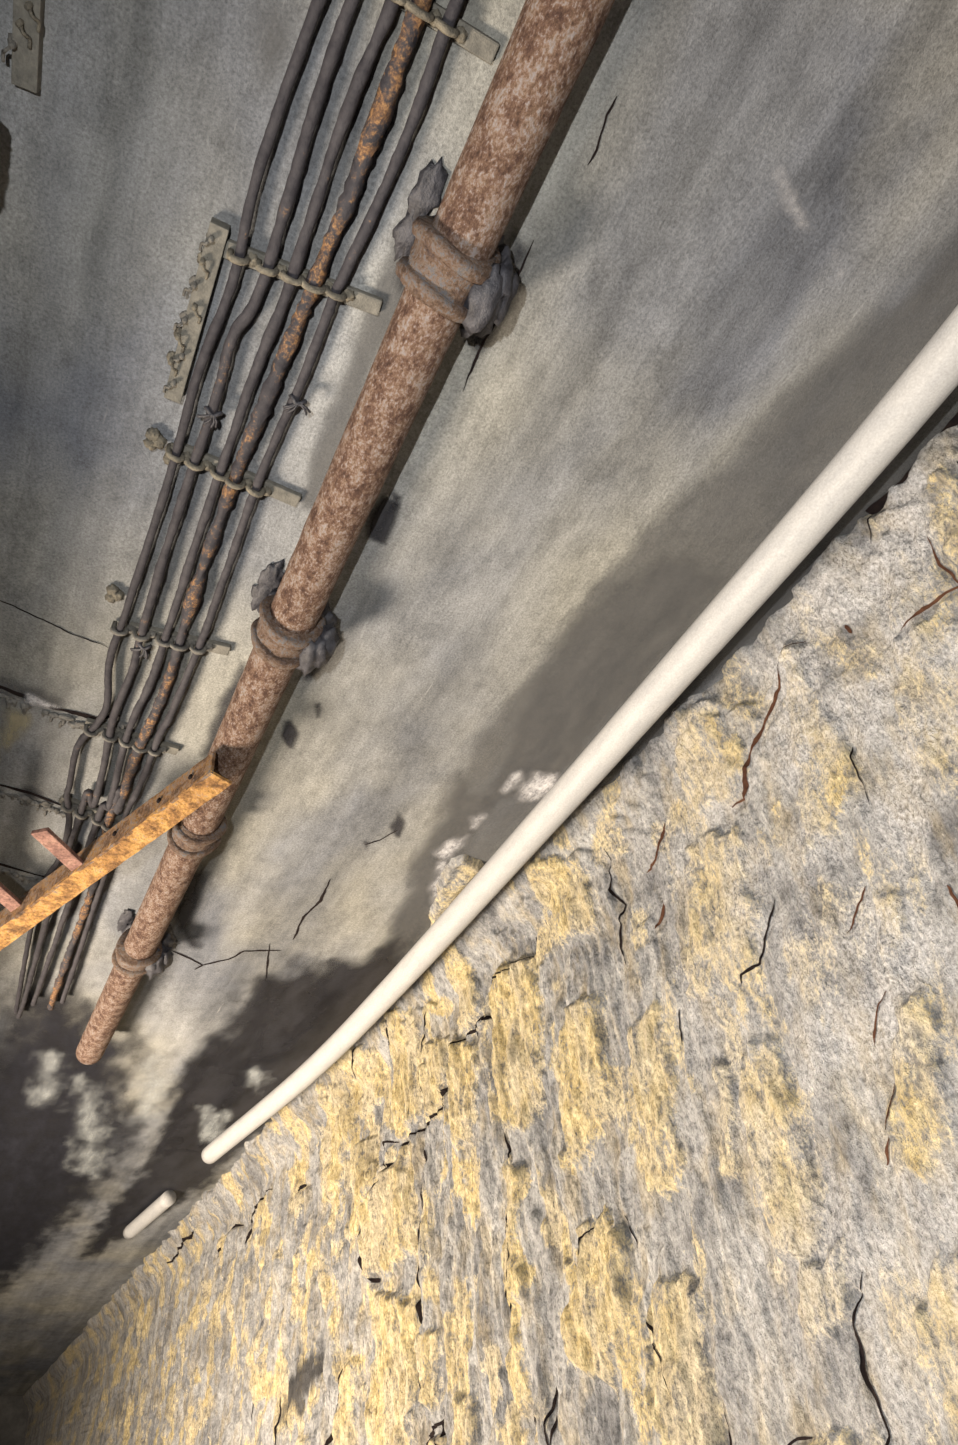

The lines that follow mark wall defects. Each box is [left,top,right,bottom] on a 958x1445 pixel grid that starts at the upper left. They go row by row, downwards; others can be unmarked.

crack [0,600,107,647]
leakage [27,694,51,707]
leakage [81,244,958,1256]
leakage [0,991,140,1289]
leakage [280,1354,324,1425]